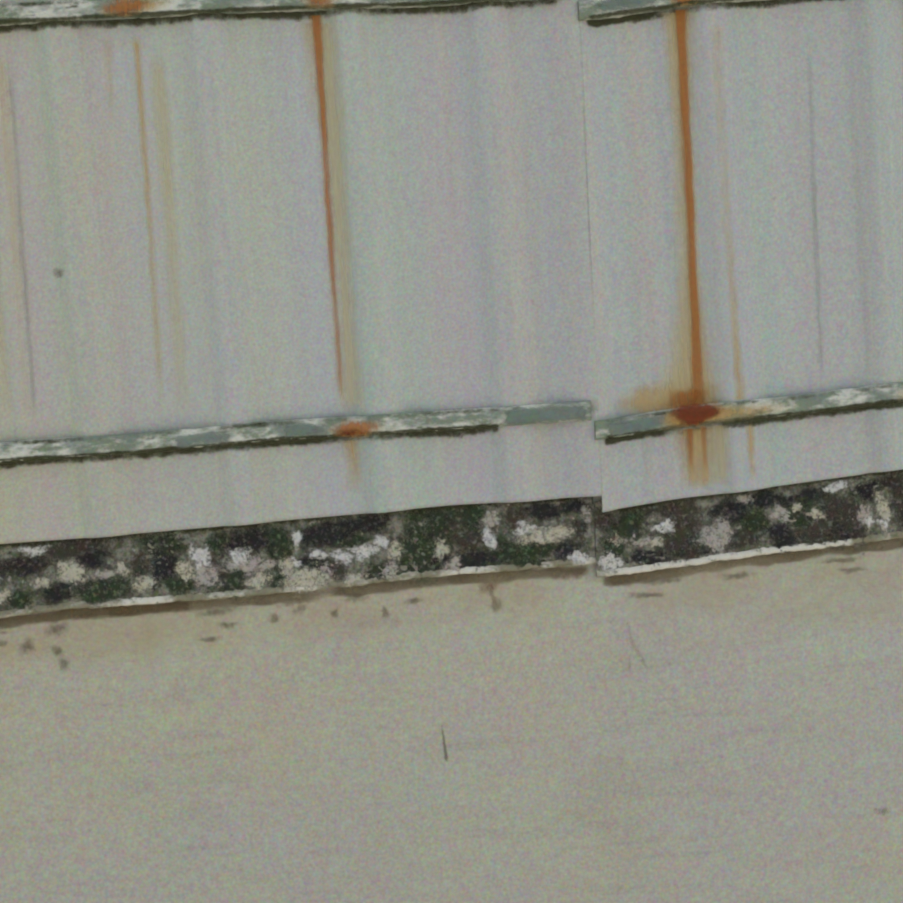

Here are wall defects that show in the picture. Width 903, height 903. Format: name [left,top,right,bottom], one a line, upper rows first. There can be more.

corrosion [310,0,336,302]
corrosion [635,0,730,469]
corrosion [337,421,377,436]
damp [0,472,903,631]